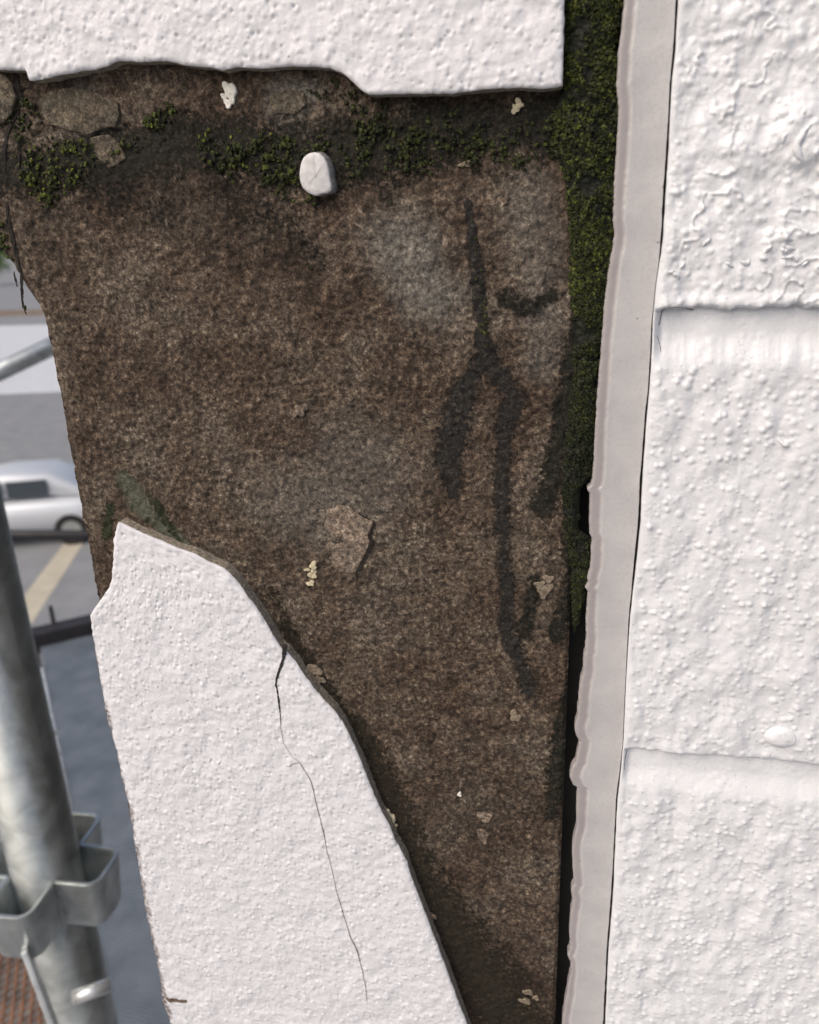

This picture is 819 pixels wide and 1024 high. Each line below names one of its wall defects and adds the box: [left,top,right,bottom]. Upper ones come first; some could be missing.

water stain [202,171,326,274]
spalling [0,64,574,1024]
water stain [429,198,576,698]
crack [275,643,367,999]
water stain [542,676,568,822]